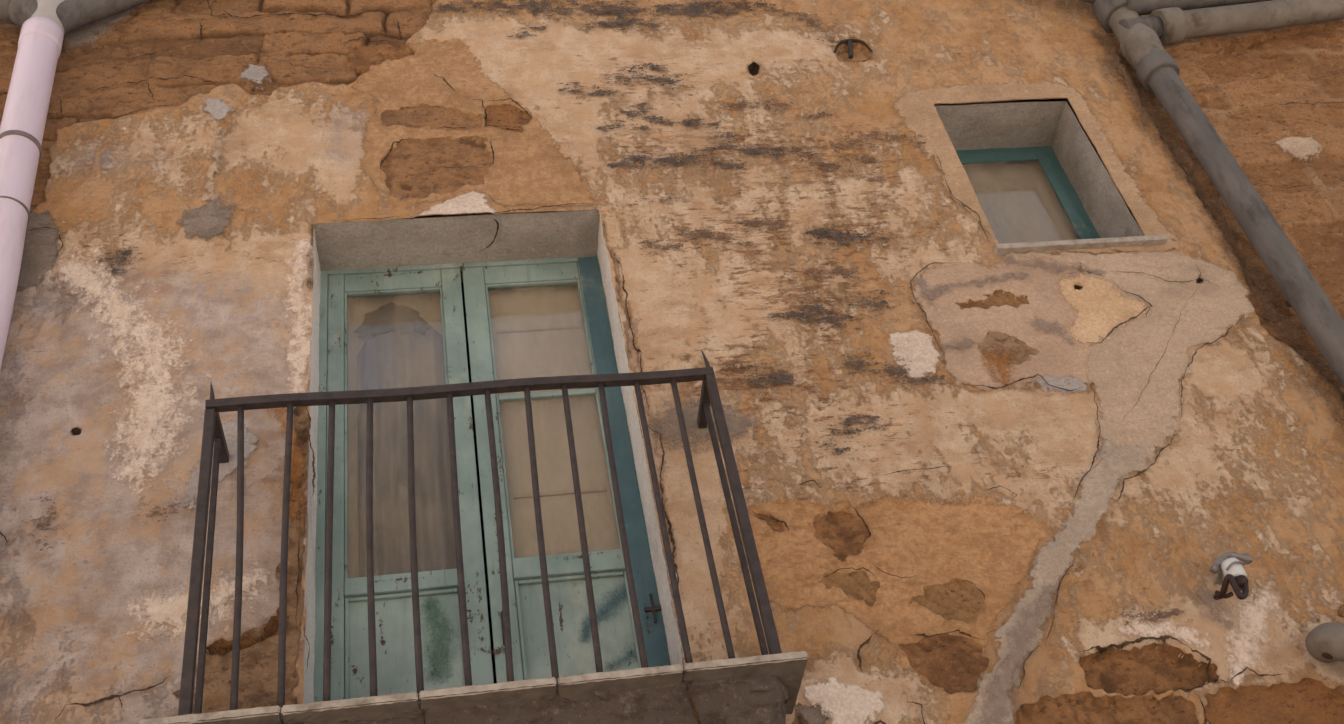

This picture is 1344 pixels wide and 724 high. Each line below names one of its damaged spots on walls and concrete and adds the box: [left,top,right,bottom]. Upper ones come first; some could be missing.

peeling [0,21,21,126]
peeling [29,0,686,665]